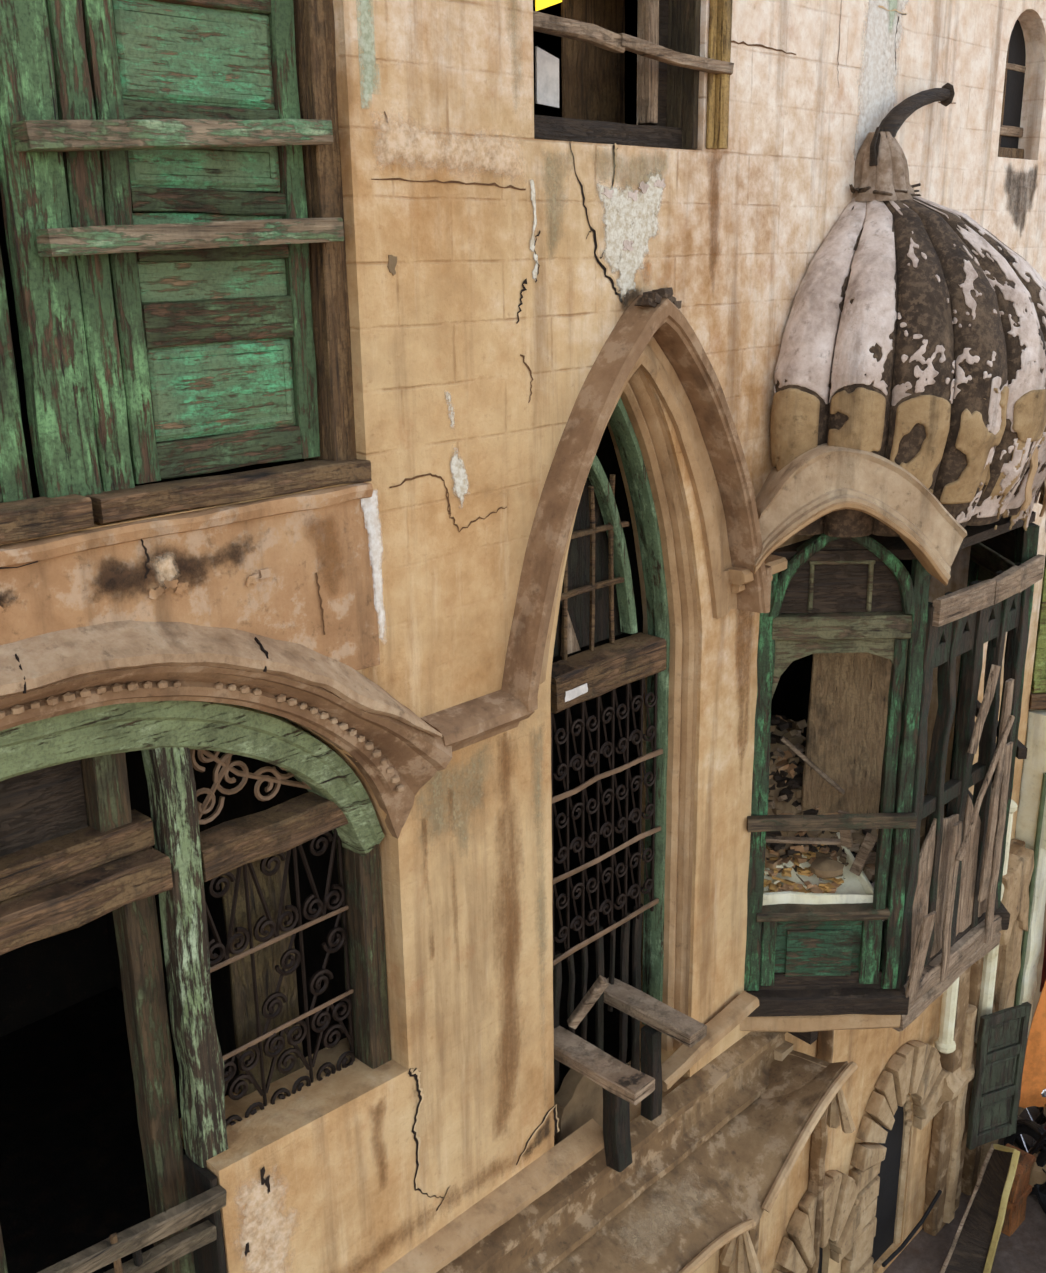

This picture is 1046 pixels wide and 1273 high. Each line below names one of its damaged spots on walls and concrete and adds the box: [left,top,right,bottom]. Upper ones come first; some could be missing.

crack [371,178,526,190]
crack [570,141,623,304]
spalling [597,157,682,309]
damp [1006,167,1037,229]
crack [389,473,507,532]
peeling [451,451,468,504]
damp [96,542,247,596]
peeling [361,491,385,638]
crack [408,1068,449,1211]